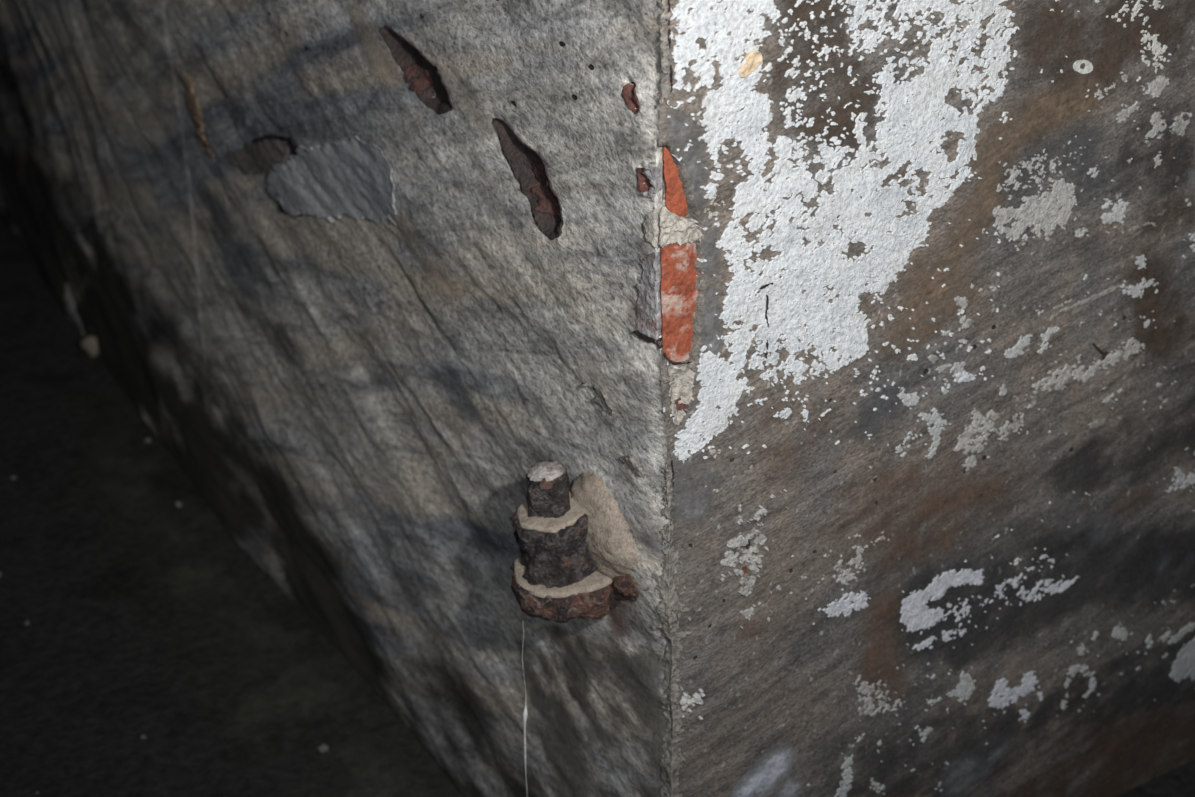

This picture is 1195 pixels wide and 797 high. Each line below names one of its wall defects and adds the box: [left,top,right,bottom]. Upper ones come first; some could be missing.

spalling [379,26,453,114]
peeling [1086,0,1192,168]
spalling [492,118,564,240]
peeling [619,0,1159,526]
peeling [1163,467,1195,493]
spalling [679,686,705,720]
peeling [813,588,871,625]
peeling [834,674,905,797]
peeling [909,725,933,746]
peeling [900,547,1080,713]
peeling [982,671,1043,745]
peeling [1056,622,1195,717]